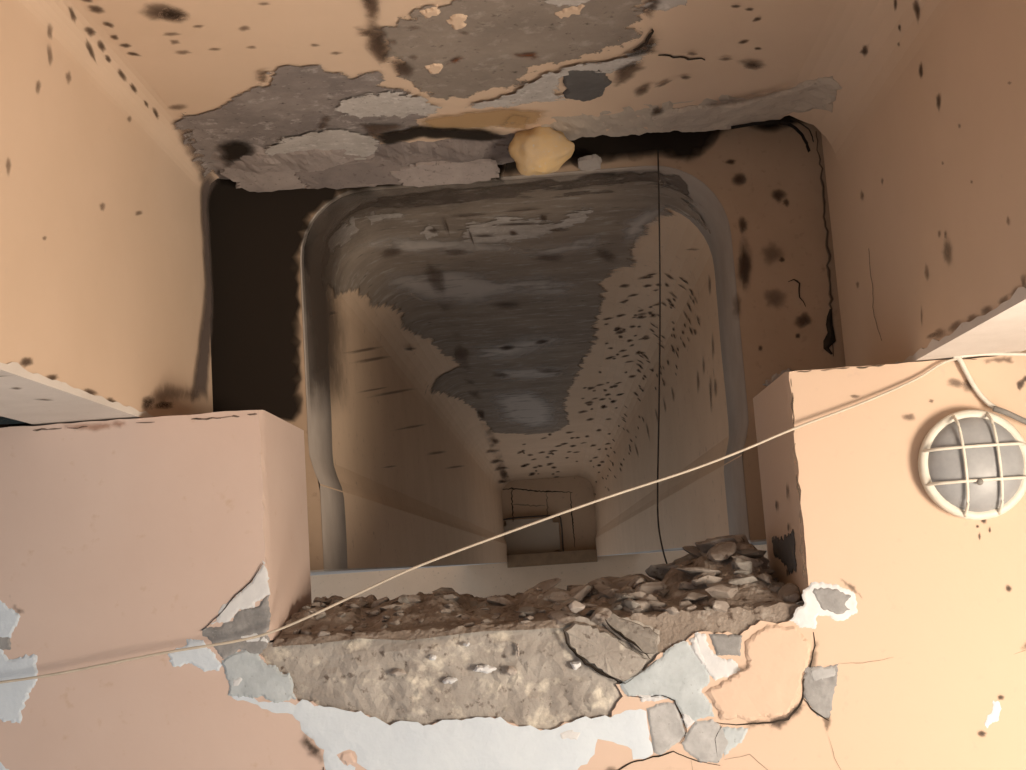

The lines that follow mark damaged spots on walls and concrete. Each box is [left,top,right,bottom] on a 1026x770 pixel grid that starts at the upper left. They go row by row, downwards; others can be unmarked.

mould [84,0,139,62]
damp [147,6,184,21]
damp [178,121,519,421]
peeling [175,0,711,435]
damp [563,130,723,165]
peeling [541,76,842,141]
crack [731,118,836,356]
damp [517,274,700,495]
flaking render [772,445,858,629]
peeling [0,600,38,723]
spalling [168,560,749,770]
crack [610,751,764,770]